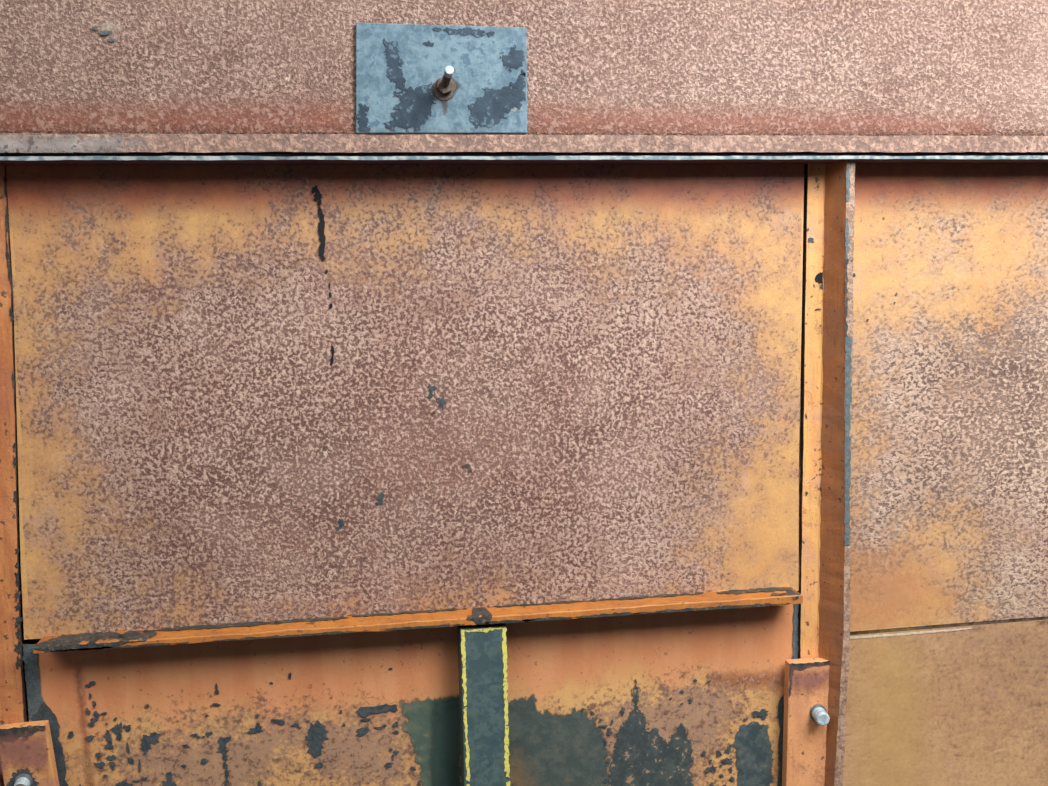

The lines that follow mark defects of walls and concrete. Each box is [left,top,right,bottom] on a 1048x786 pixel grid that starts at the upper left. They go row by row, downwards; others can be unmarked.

peeling [423,26,495,47]
rust [0,104,344,130]
peeling [357,103,371,132]
peeling [383,38,437,132]
peeling [467,45,526,129]
rust [538,113,885,131]
rust [11,164,802,634]
rust [850,173,1048,629]
peeling [0,547,830,786]
rust [85,696,421,786]
rust [586,671,830,786]